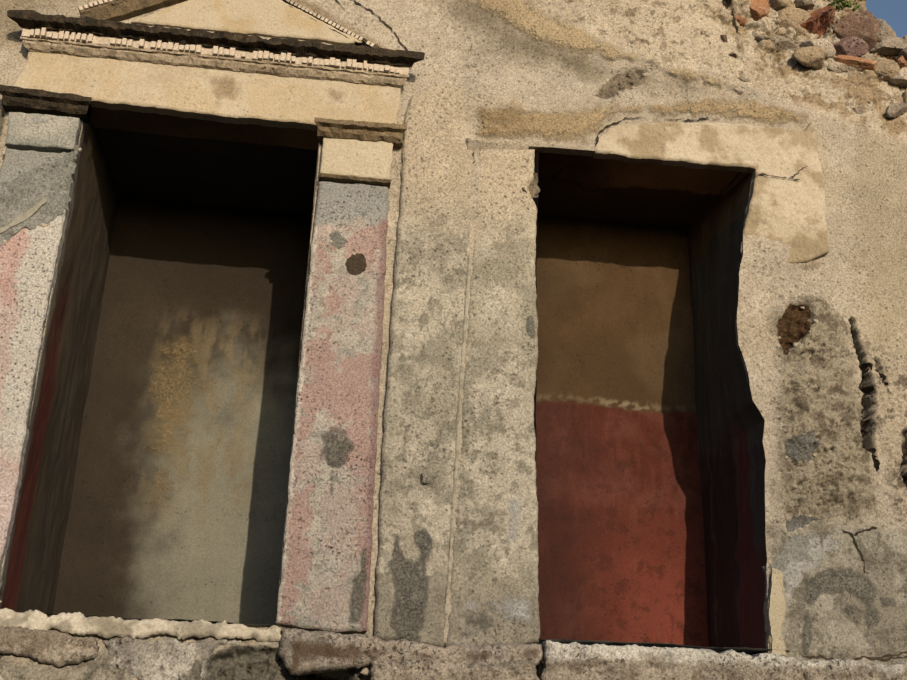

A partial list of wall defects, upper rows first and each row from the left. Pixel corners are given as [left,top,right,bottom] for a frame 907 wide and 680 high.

crack [336,0,412,68]
spalling [596,69,651,99]
spalling [329,231,348,249]
spalling [345,253,367,275]
spalling [776,304,818,354]
crack [851,326,907,482]
water stain [323,428,354,467]
water stain [389,529,431,642]